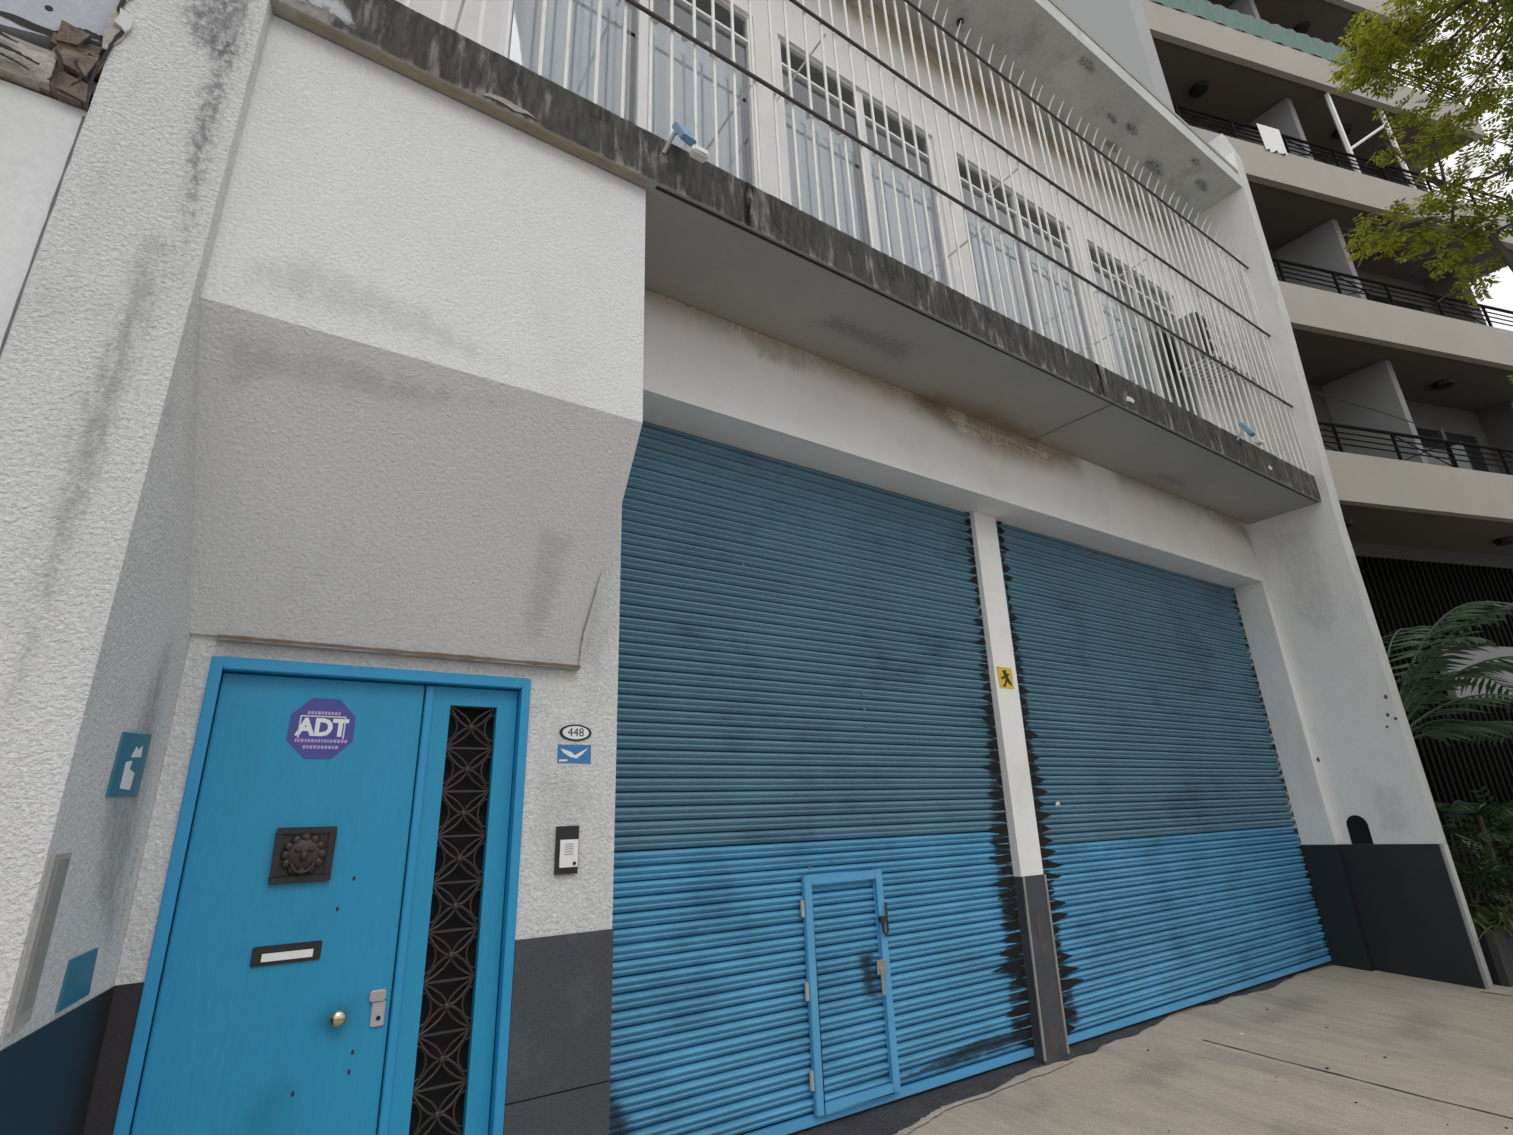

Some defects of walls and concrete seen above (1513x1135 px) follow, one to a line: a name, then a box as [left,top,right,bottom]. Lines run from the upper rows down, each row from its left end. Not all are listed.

crack [0,31,40,70]
spalling [0,0,133,112]
leakage [194,0,245,87]
leakage [331,0,1321,501]